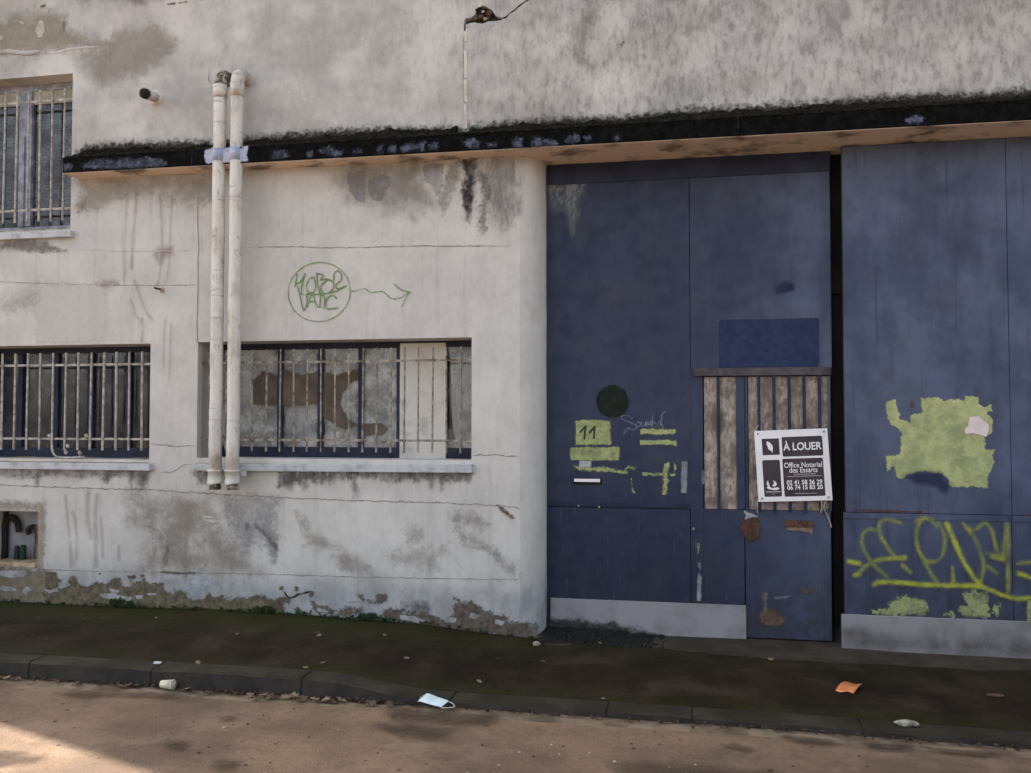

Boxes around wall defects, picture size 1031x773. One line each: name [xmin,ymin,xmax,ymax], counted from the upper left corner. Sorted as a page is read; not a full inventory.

damp [0,15,91,50]
damp [461,158,515,223]
rust [741,517,760,542]
peeling [0,567,291,613]
peeling [310,593,540,638]